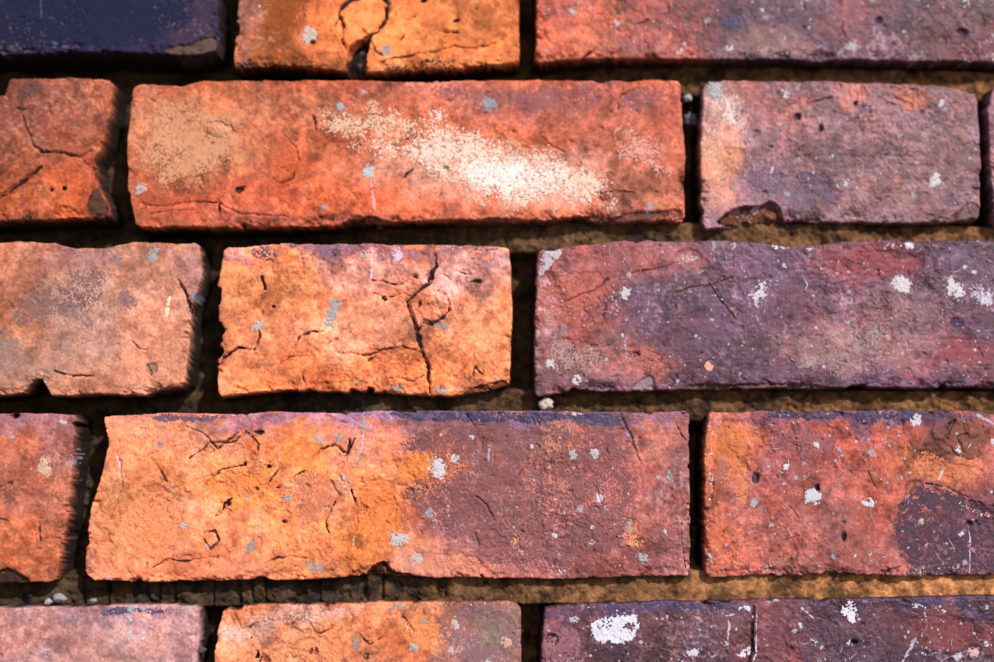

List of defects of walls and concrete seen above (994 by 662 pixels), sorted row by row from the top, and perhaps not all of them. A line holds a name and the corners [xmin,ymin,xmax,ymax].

spalling [346,41,371,81]
crack [0,107,90,198]
damp [317,99,622,217]
crack [219,330,262,365]
crack [280,330,338,382]
crack [361,254,469,393]
crack [188,431,260,485]
crack [268,439,354,483]
crack [151,498,233,569]
crack [325,489,357,534]
spalling [892,416,994,576]
crack [747,611,755,662]